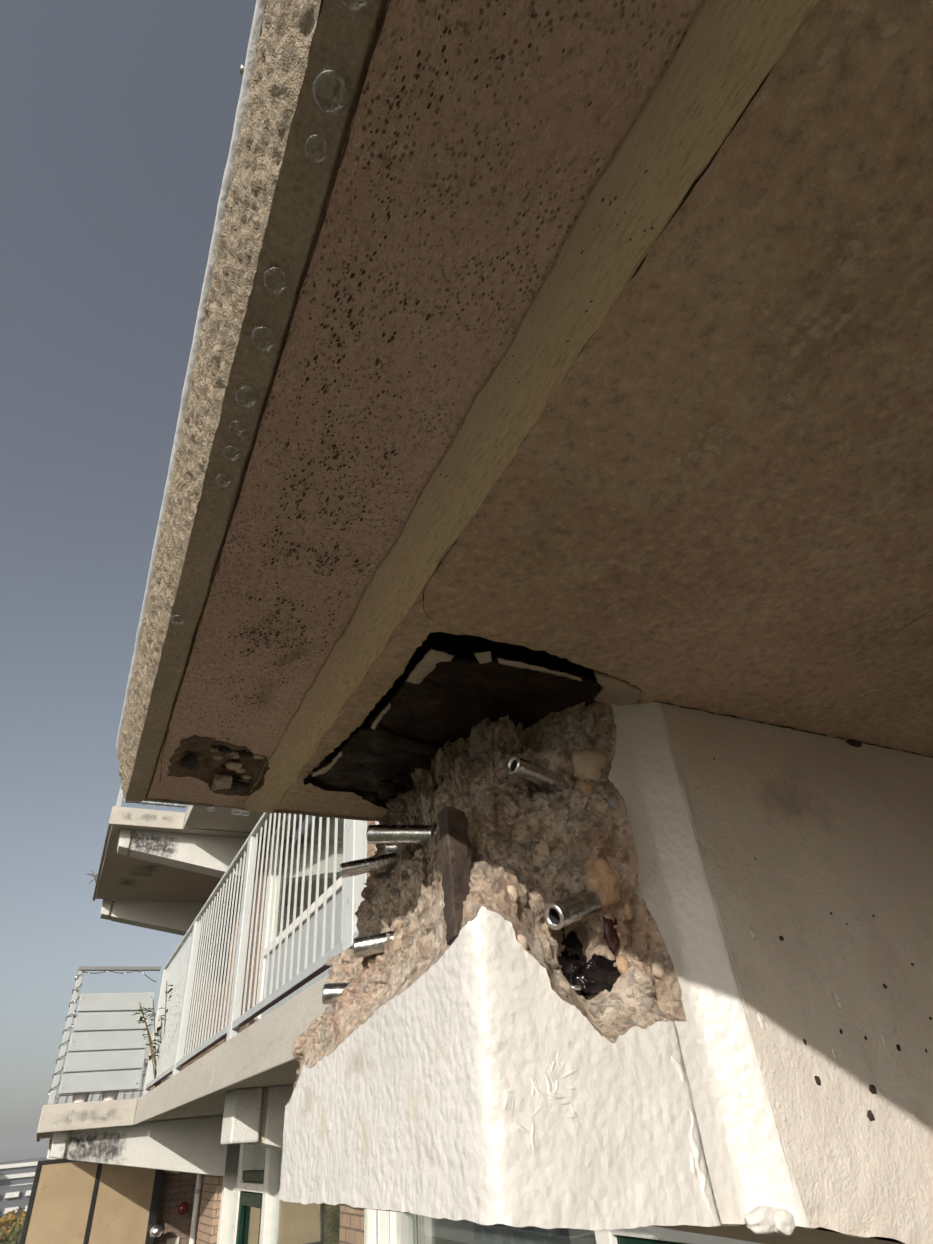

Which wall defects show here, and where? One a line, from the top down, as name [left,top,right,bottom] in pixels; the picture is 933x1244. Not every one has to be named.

spalling [363,15,506,182]
spalling [167,196,448,796]
corrosion [437,807,477,945]
spalling [286,632,686,1105]
water stain [69,1134,119,1161]